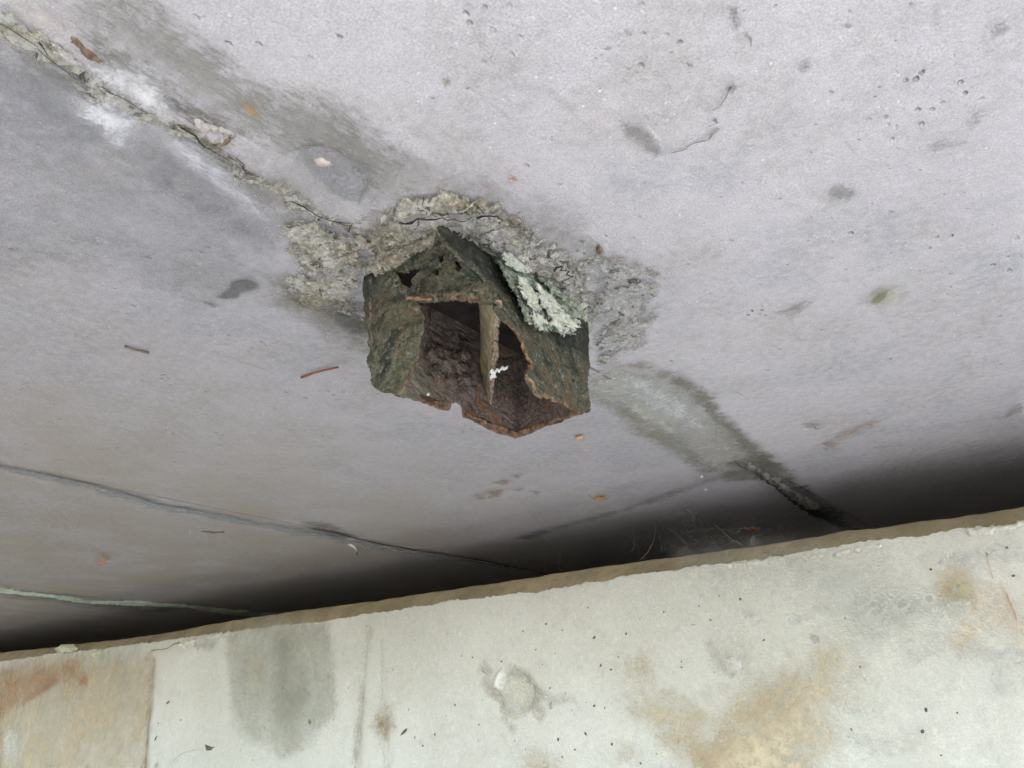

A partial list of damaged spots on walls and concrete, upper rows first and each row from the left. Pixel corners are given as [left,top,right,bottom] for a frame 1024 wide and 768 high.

crack [0,3,368,234]
damp [25,0,416,192]
damp [174,140,310,215]
spalling [274,145,669,374]
damp [589,364,786,480]